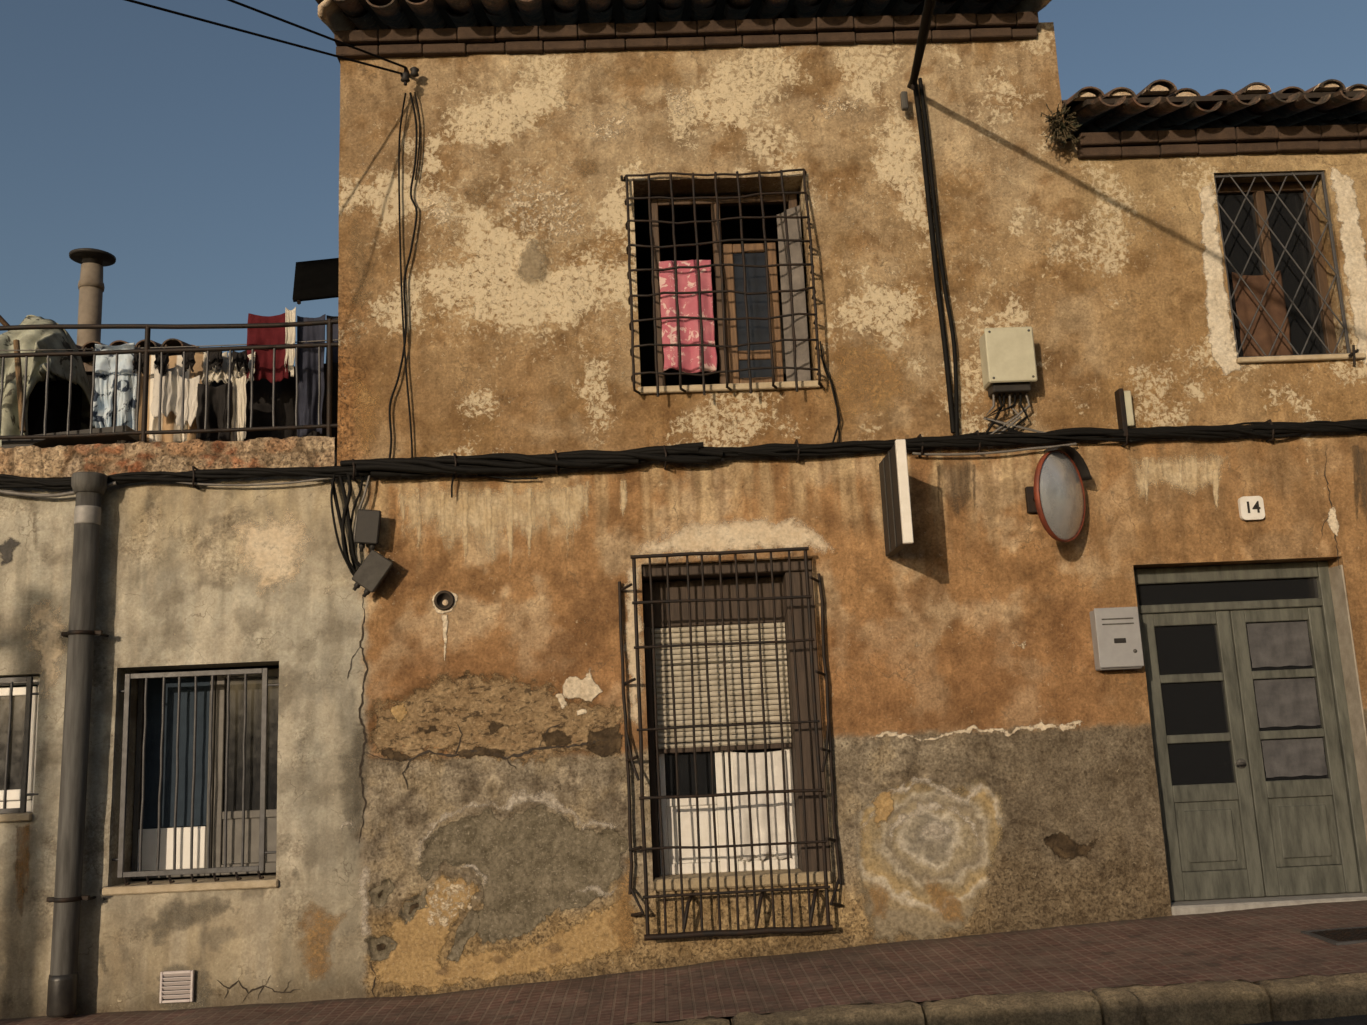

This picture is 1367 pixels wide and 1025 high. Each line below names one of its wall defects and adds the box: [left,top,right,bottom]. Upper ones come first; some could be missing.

peeling [421,172,594,325]
crack [347,596,620,839]
flaking render [366,590,623,766]
crack [217,975,299,1003]
spalling [371,875,633,994]
water stain [857,777,1003,943]